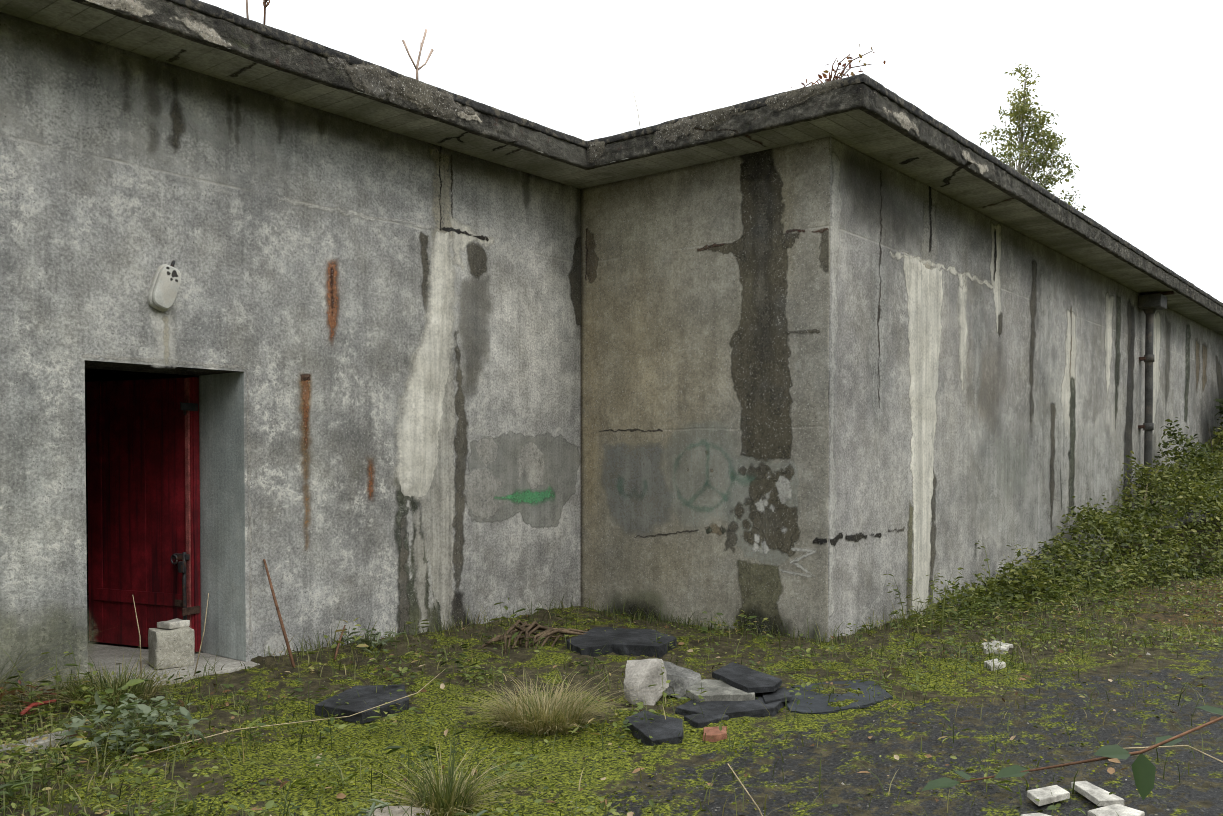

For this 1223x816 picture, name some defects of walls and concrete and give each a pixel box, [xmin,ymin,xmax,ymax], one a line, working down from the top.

crack [438,132,489,242]
crack [492,141,526,155]
water stain [0,54,540,635]
rust [326,261,339,340]
water stain [697,149,1003,616]
water stain [1029,260,1135,528]
rust [299,374,310,546]
peeling [635,462,801,556]
crack [813,528,904,546]
water stain [736,560,788,637]